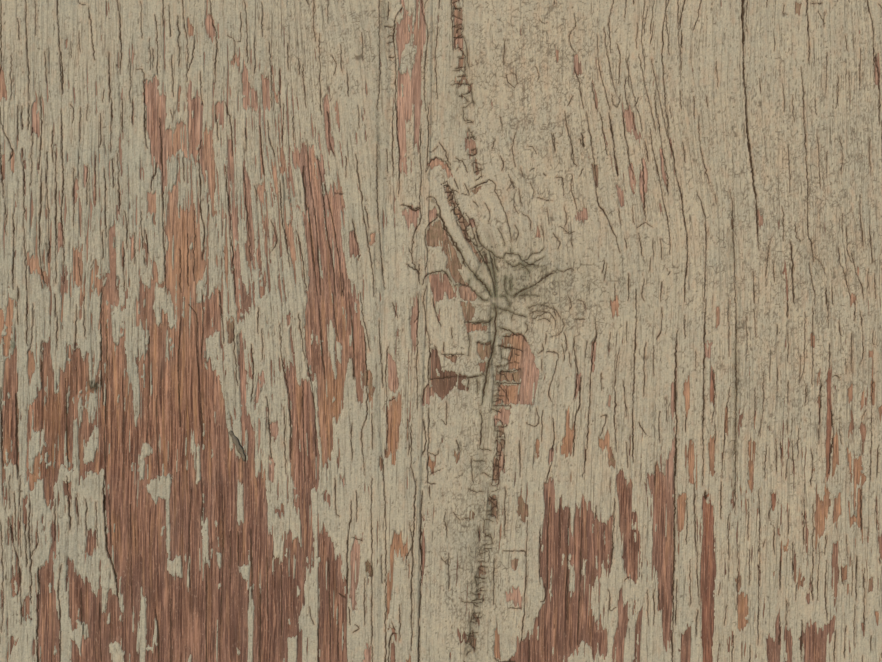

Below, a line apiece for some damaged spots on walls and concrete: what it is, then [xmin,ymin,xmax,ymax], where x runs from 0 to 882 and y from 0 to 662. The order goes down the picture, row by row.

crack [0,298,133,662]
crack [178,296,204,426]
crack [189,489,282,662]
crack [251,311,263,397]
peeling [0,0,546,662]
crack [267,0,882,662]
peeling [494,340,882,662]